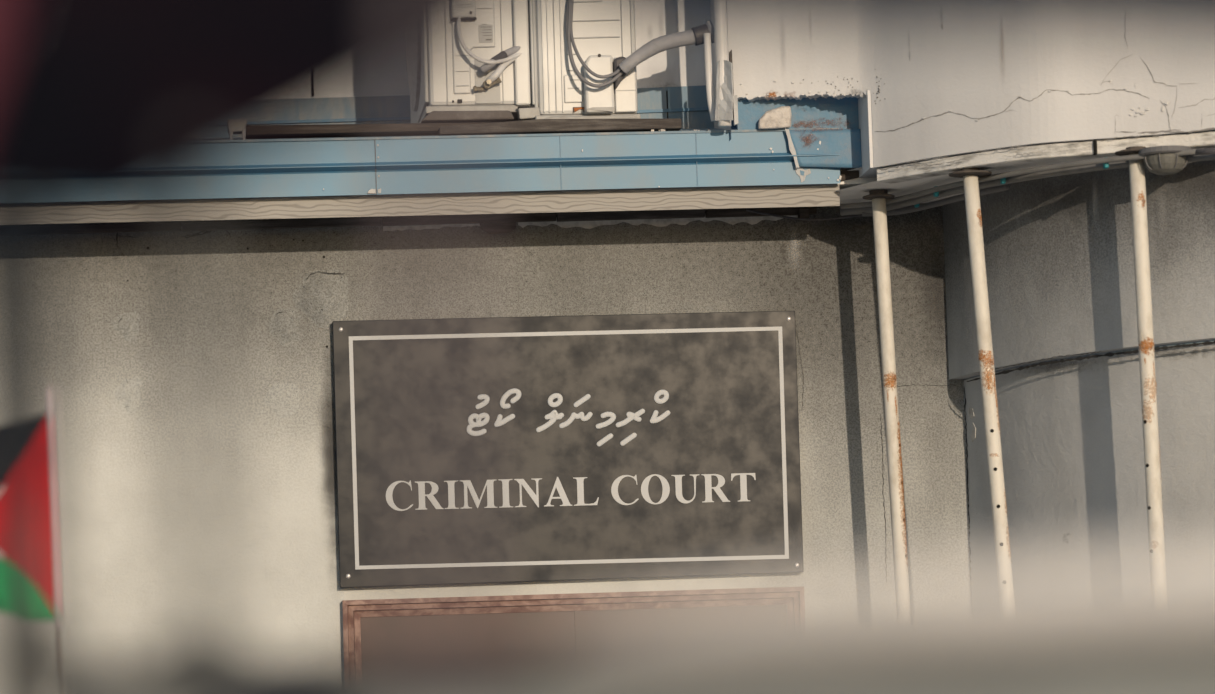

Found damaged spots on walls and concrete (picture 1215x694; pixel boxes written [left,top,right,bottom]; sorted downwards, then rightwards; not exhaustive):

crack [875,38,1215,134]
rust [884,373,908,566]